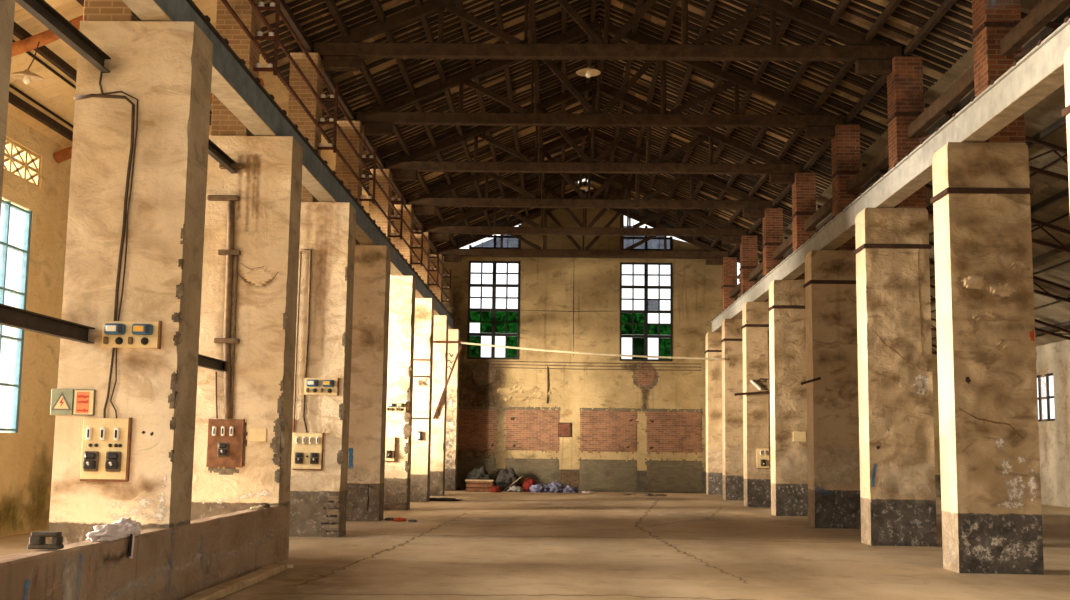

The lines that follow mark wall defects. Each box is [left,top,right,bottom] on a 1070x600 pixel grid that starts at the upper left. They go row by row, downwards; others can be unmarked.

water stain [238,155,260,211]
spalling [171,283,184,346]
spalling [168,370,180,430]
crack [959,408,1023,438]
spalling [202,376,340,532]
peeling [996,438,1038,512]
efflorescence [945,518,1042,562]